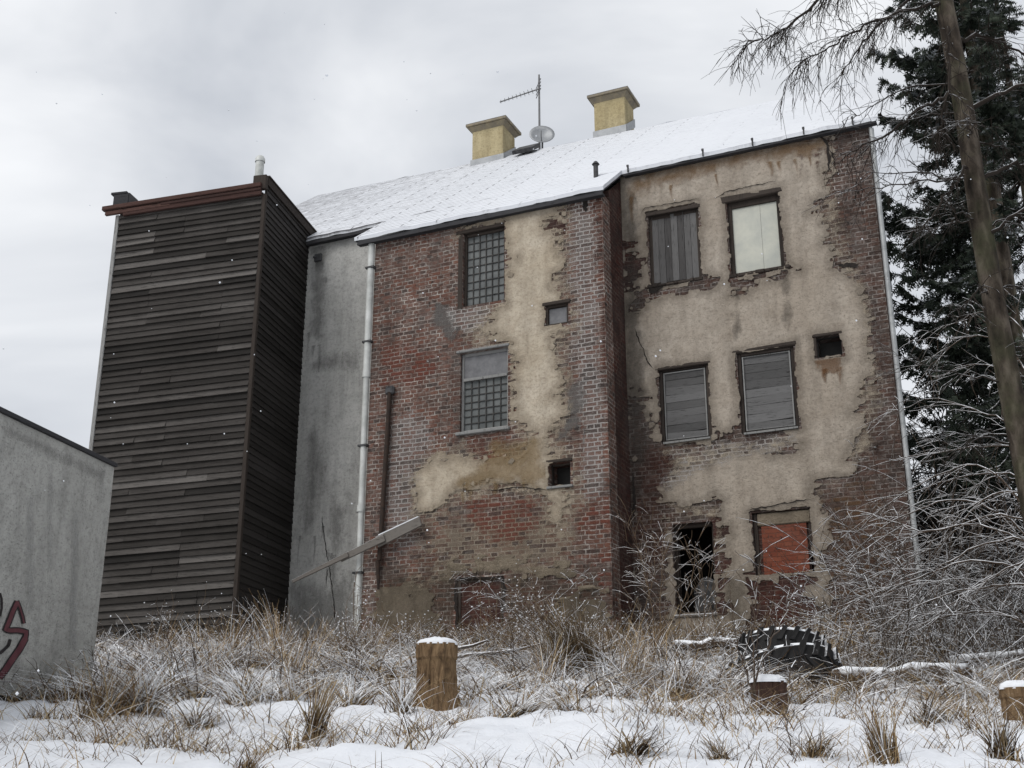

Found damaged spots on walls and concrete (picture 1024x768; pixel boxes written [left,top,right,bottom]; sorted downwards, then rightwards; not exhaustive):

peeling [410,205,584,540]
spalling [623,241,802,314]
spalling [743,128,919,645]
peeling [364,579,444,645]
peeling [549,578,612,637]
spalling [628,387,802,641]